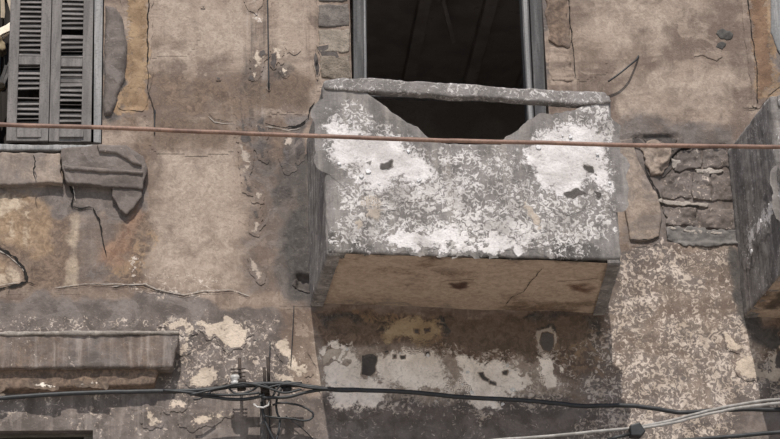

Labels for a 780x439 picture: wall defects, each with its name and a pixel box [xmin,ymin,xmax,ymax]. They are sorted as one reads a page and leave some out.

crack [568,0,576,76]
crack [747,0,758,109]
flaking render [742,0,780,108]
crack [0,247,35,292]
crack [69,186,107,256]
crack [55,283,249,297]
peeling [156,312,258,356]
water stain [276,154,314,309]
peeling [271,308,572,421]
peeling [233,98,630,259]
flaking render [632,133,780,270]
water stain [720,244,780,355]